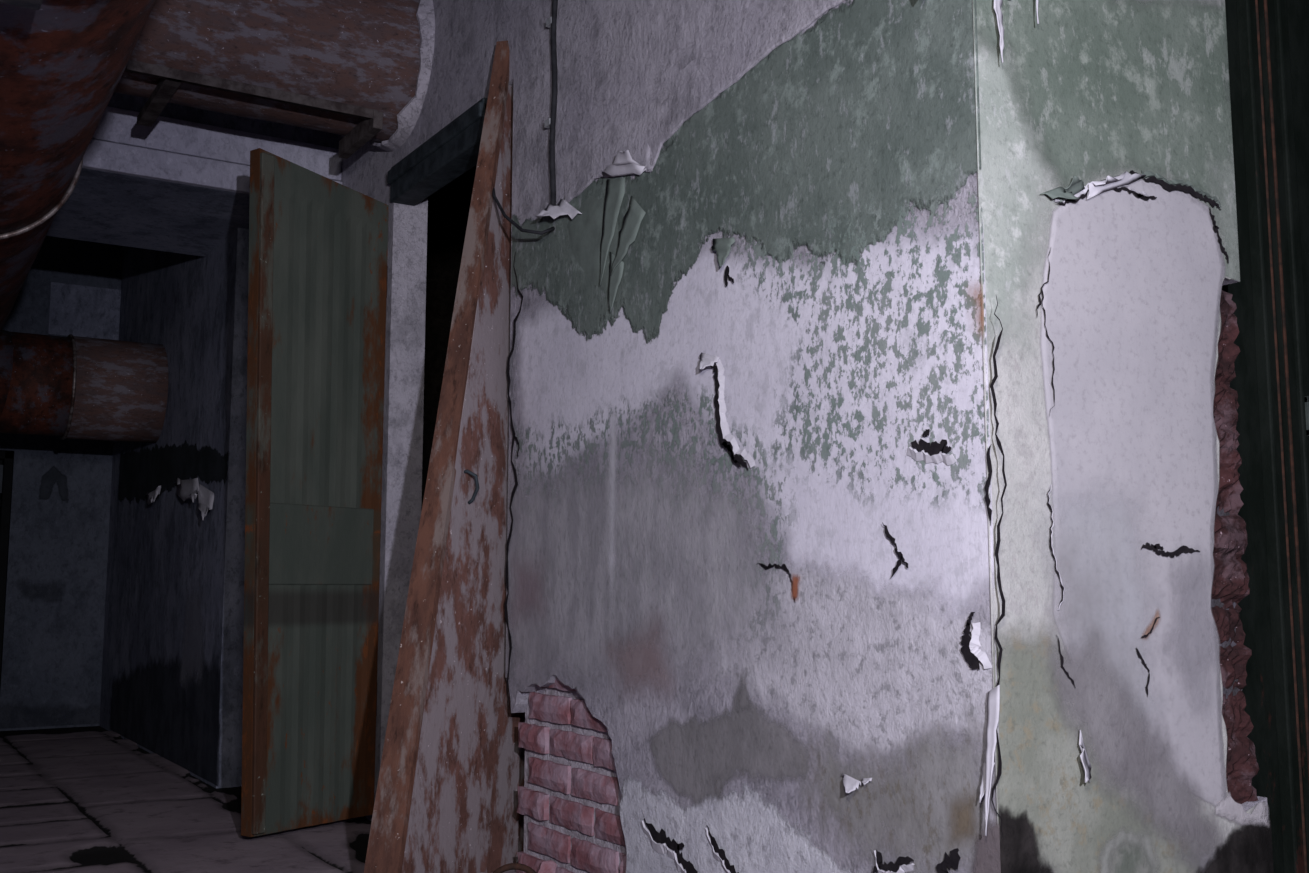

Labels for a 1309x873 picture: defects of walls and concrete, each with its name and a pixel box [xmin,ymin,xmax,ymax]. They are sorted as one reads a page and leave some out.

peeling [511,0,1269,873]
crack [1141,542,1200,558]
crack [640,818,739,873]
leakage [650,681,1053,873]
leakage [1055,645,1274,873]